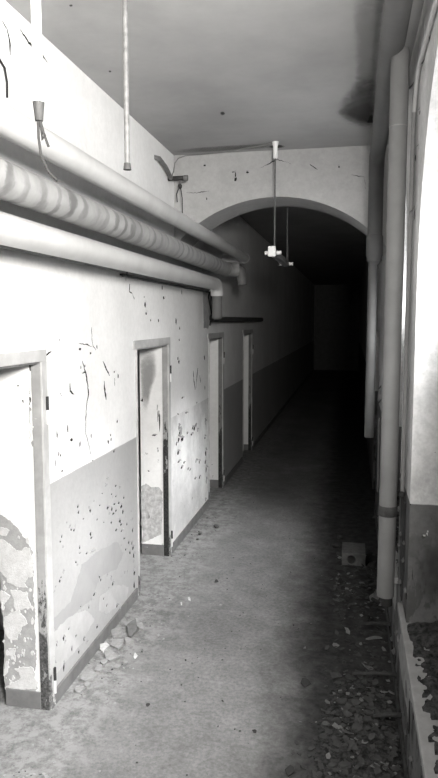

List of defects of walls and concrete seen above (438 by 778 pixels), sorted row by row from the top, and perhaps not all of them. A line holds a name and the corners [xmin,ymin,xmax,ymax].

crack [2,21,47,62]
damp [343,89,374,122]
crack [60,328,115,454]
peeling [0,515,39,691]
peeling [54,477,163,674]